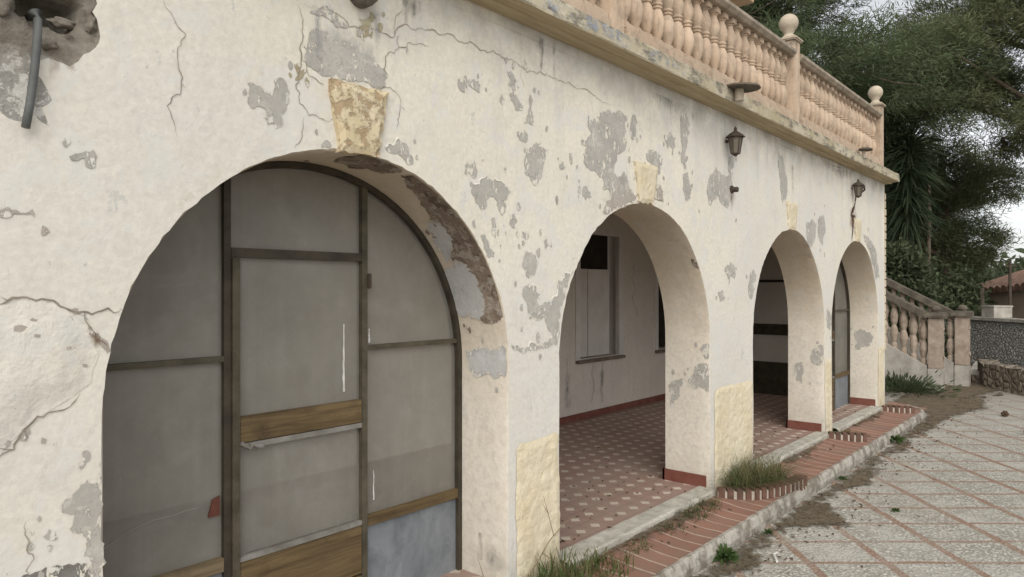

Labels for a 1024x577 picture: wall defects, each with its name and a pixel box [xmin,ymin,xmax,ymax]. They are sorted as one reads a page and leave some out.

spalling [0,0,100,126]
crack [164,4,186,135]
peeling [243,5,388,129]
crack [295,3,604,145]
peeling [500,57,641,214]
crack [0,396,79,456]
crack [0,296,121,352]
spalling [334,137,574,393]
peeling [669,342,709,408]
peeling [851,326,874,350]
peeling [22,450,107,577]